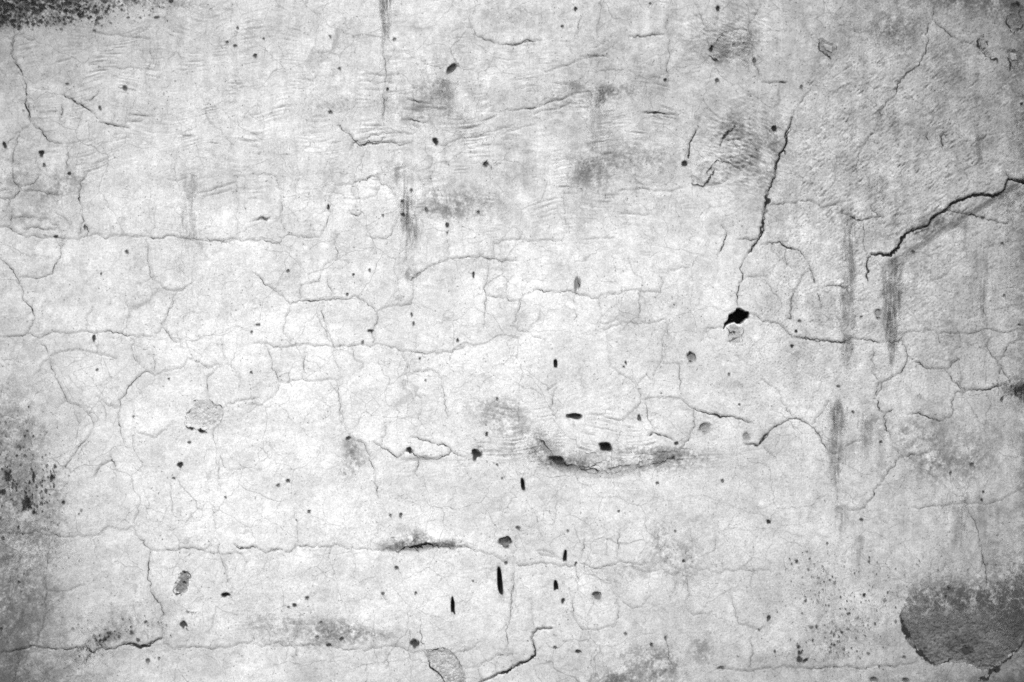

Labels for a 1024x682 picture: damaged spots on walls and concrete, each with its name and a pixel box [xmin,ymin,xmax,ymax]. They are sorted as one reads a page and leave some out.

mould [0,0,173,31]
crack [339,53,402,146]
crack [0,38,132,463]
crack [259,240,594,381]
crack [719,95,1024,431]
mould [0,424,57,541]
crack [96,360,155,473]
crack [352,437,458,496]
crack [591,366,850,453]
crack [2,540,350,676]
crack [479,558,583,675]
mould [789,551,909,670]